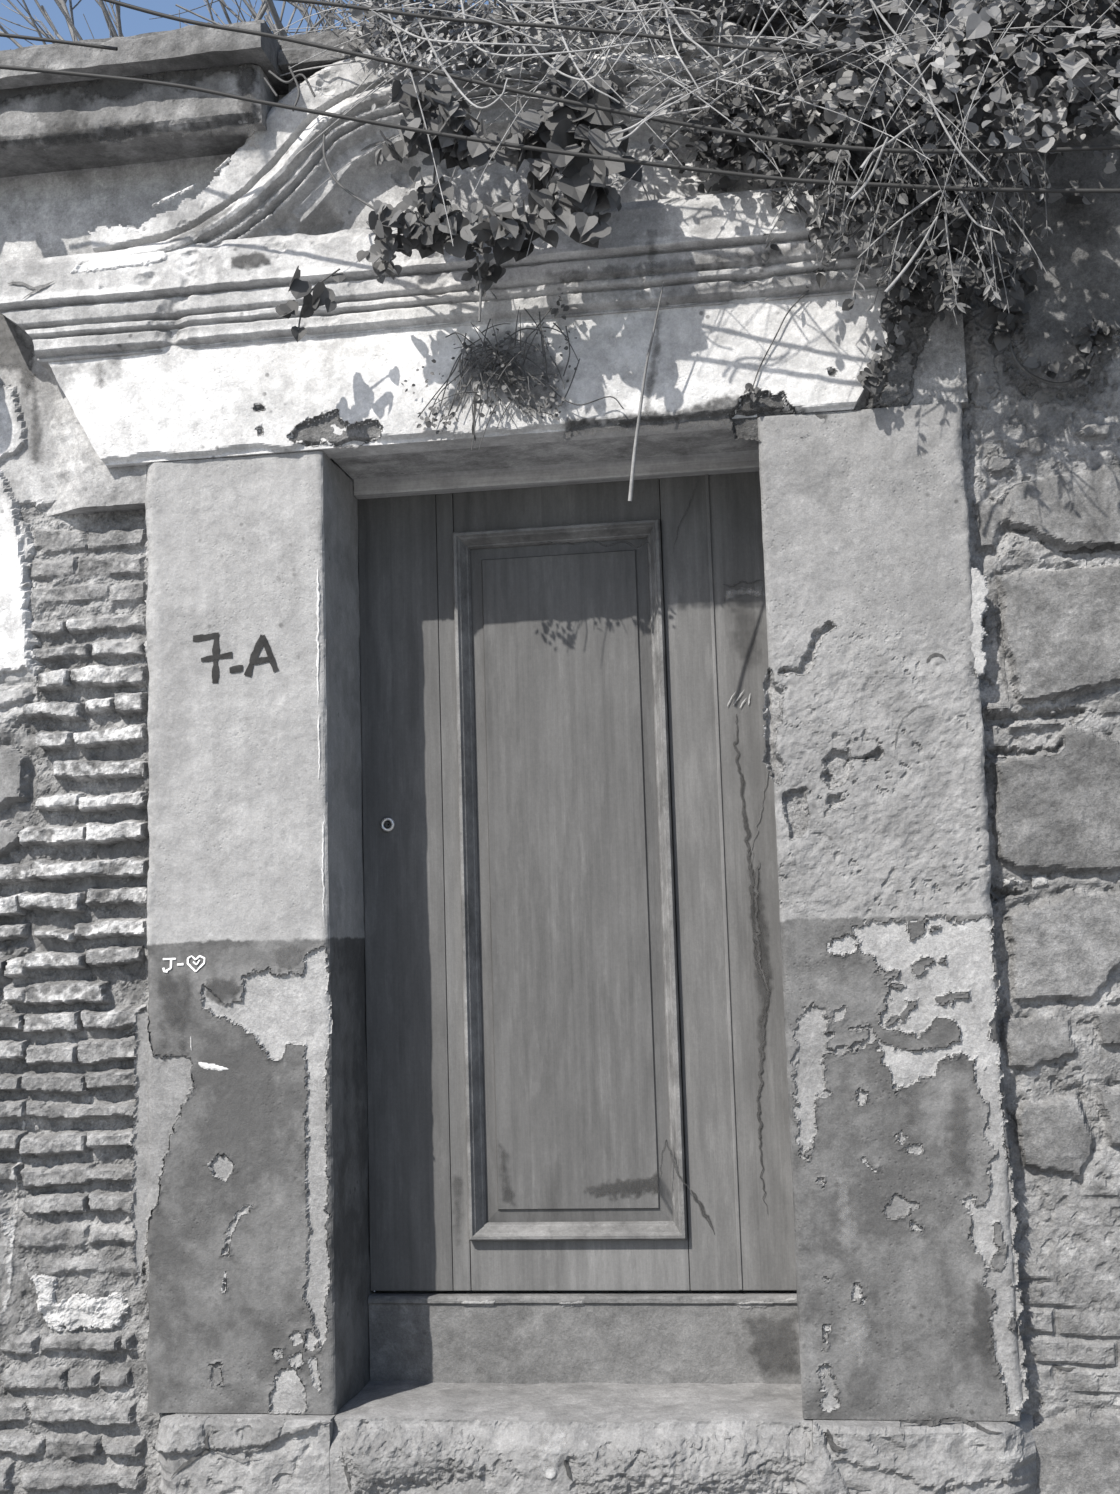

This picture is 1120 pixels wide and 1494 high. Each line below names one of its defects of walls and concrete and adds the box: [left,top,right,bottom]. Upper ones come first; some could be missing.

spalling [152,183,197,208]
spalling [286,409,383,449]
spalling [728,390,801,442]
spalling [762,621,884,840]
spalling [0,504,333,1494]
peeling [790,915,1029,1416]
crack [899,1417,1003,1439]
crack [564,1460,572,1480]
crack [827,1429,872,1490]